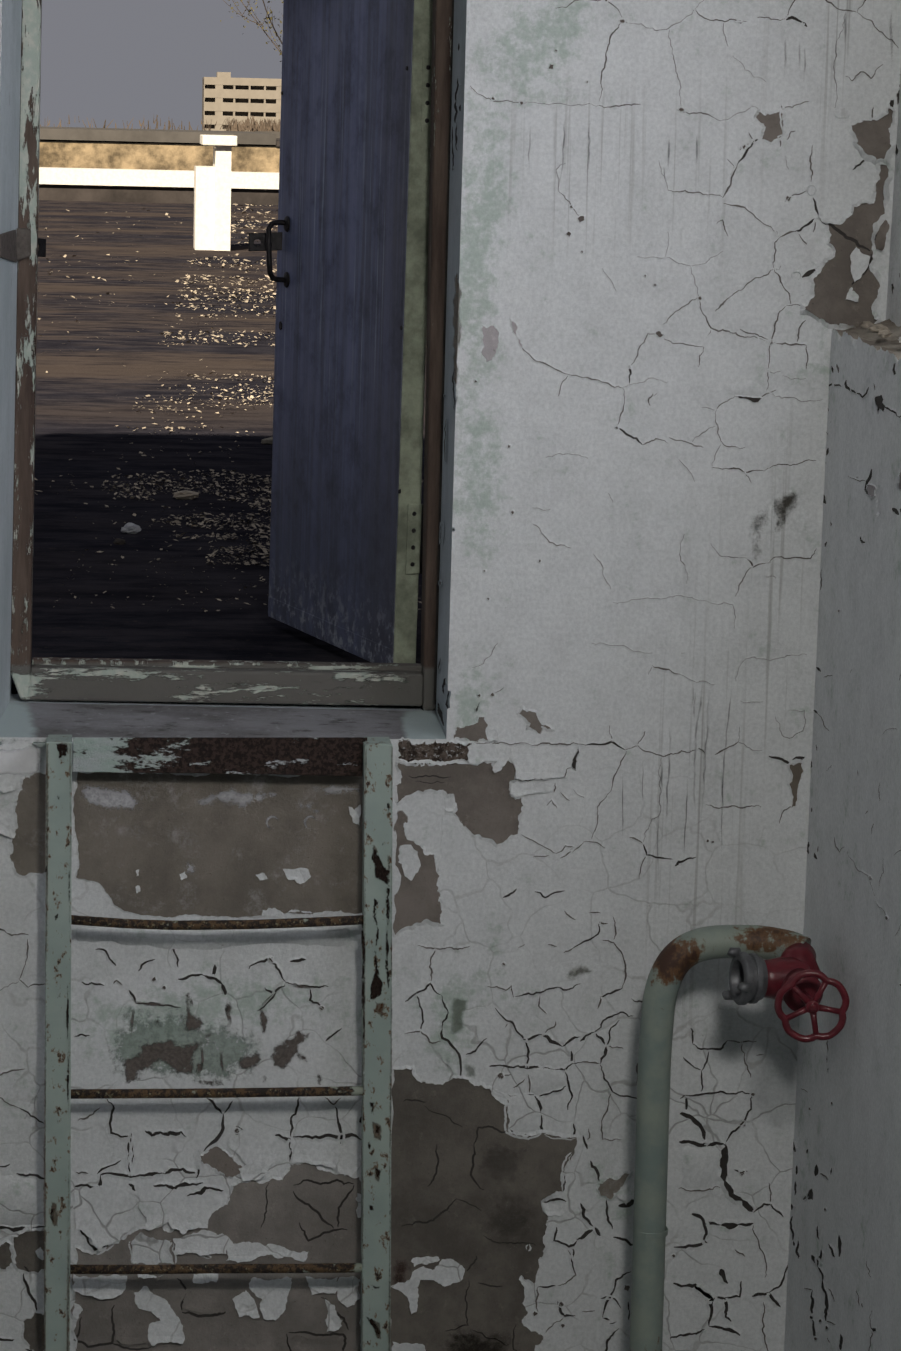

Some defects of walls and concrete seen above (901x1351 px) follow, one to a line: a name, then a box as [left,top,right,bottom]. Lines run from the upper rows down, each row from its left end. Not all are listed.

flaking render [799,106,901,330]
crack [404,0,901,1351]
peeling [0,770,46,879]
peeling [72,772,363,920]
peeling [392,655,575,937]
crack [0,926,45,992]
crack [80,946,343,1043]
crack [0,1067,45,1125]
crack [20,1273,40,1312]
crack [0,1096,361,1264]
flaking render [70,1136,361,1351]
flaking render [391,1065,581,1351]